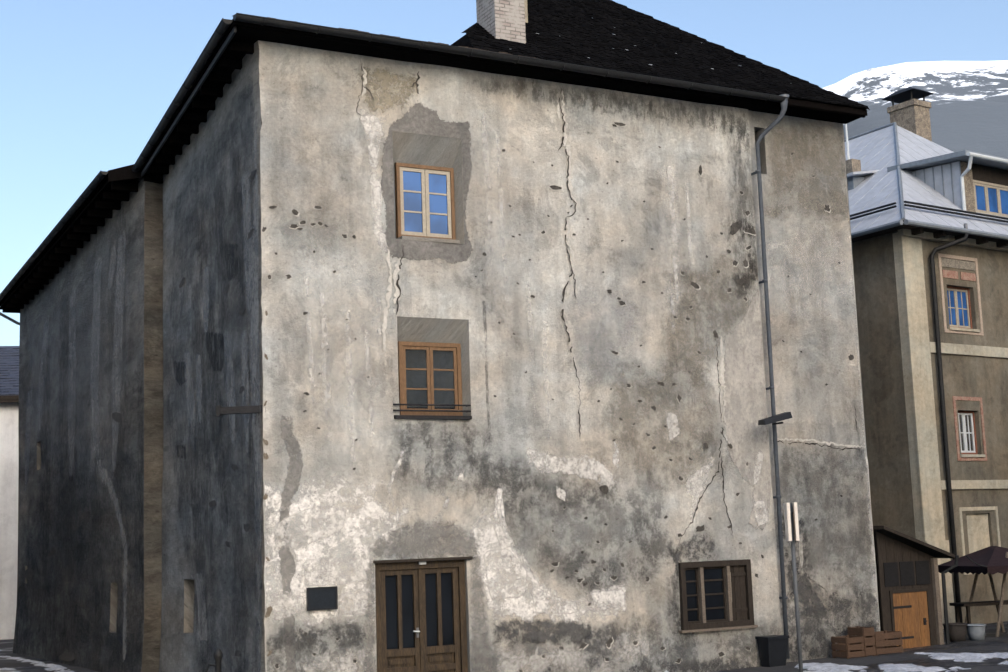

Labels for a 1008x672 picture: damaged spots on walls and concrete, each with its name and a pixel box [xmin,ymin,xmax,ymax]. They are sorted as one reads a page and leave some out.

crack [356,60,374,122]
flaking render [360,68,416,259]
crack [381,246,404,356]
crack [556,89,581,436]
flaking render [239,169,407,672]
flaking render [526,439,619,494]
crack [675,331,733,555]
crack [770,406,863,450]
flaking render [471,495,626,623]
damp [495,620,617,670]
damp [669,535,714,631]
damp [782,520,879,662]